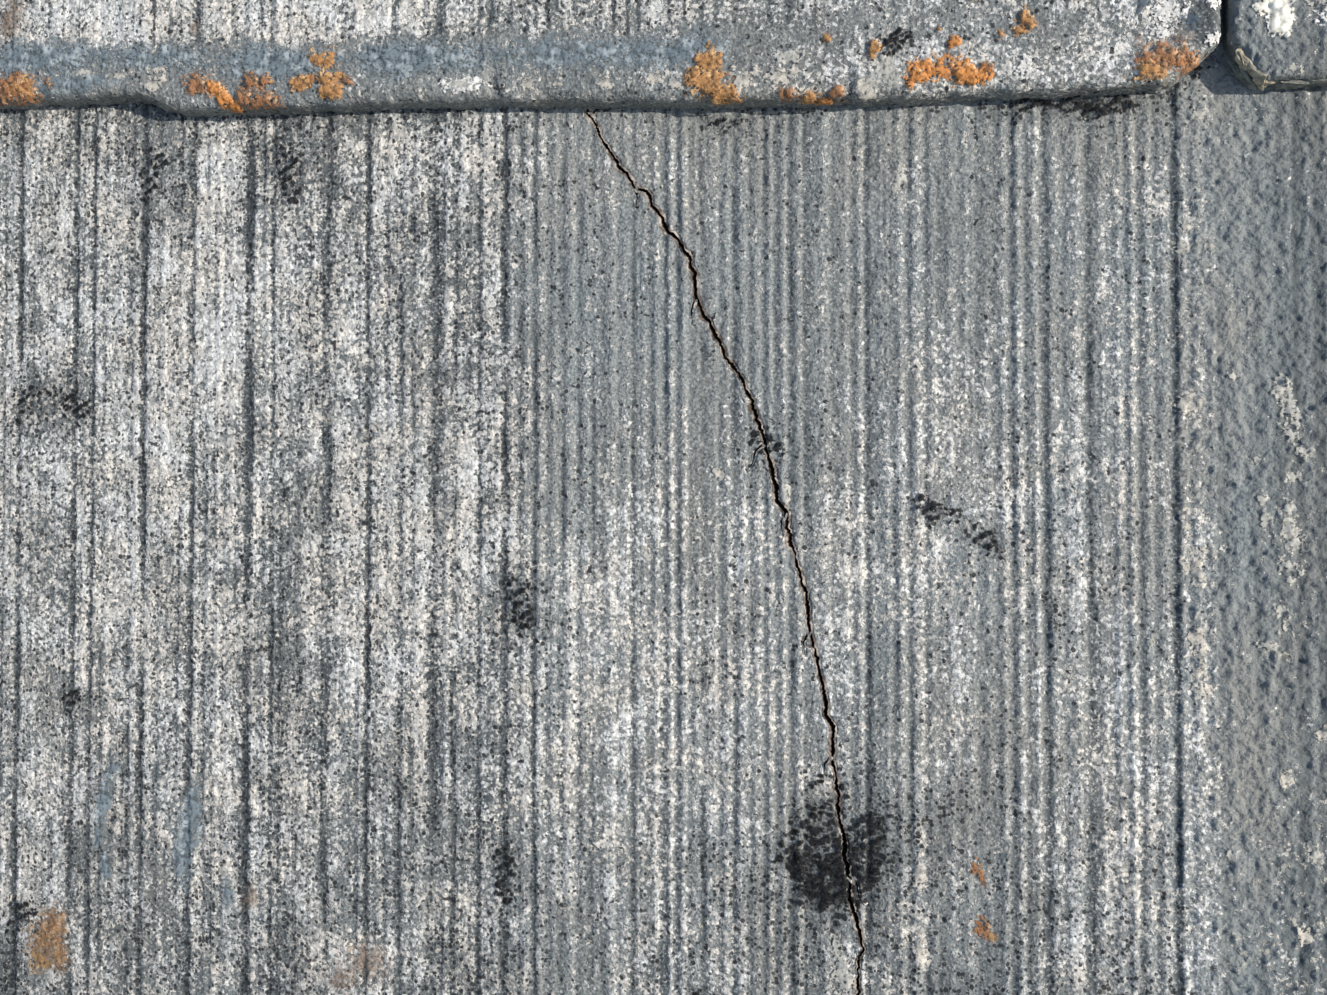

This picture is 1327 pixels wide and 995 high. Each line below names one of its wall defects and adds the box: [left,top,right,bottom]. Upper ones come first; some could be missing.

crack [584,108,868,995]